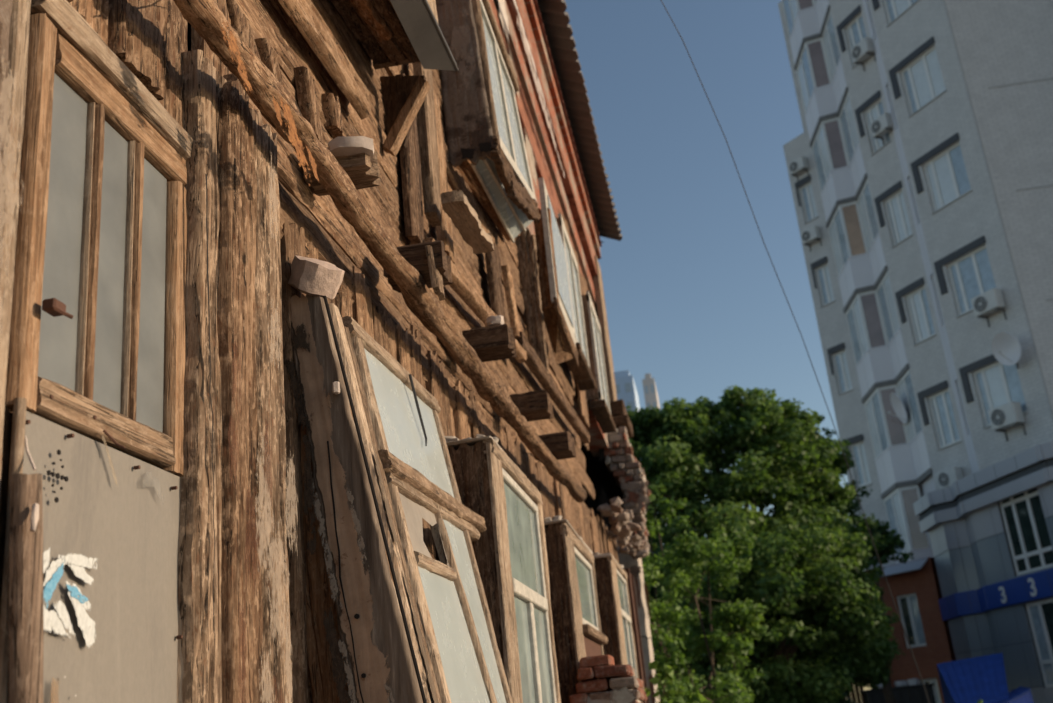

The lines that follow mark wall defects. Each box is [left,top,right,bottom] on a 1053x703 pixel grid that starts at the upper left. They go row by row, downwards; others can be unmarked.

peeling [0,22,24,275]
peeling [268,153,279,239]
peeling [255,301,357,703]
spalling [604,426,651,579]